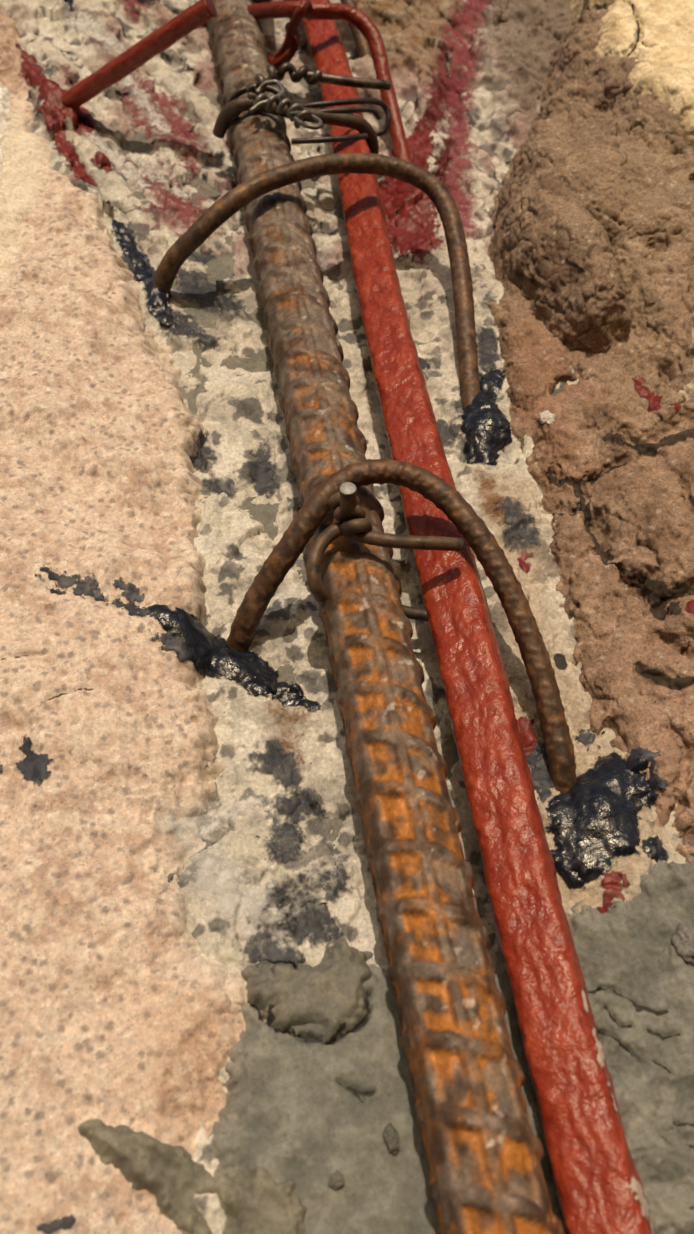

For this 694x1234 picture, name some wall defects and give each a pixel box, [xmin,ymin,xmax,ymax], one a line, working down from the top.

peeling [592,1028,618,1112]
peeling [628,1176,654,1234]